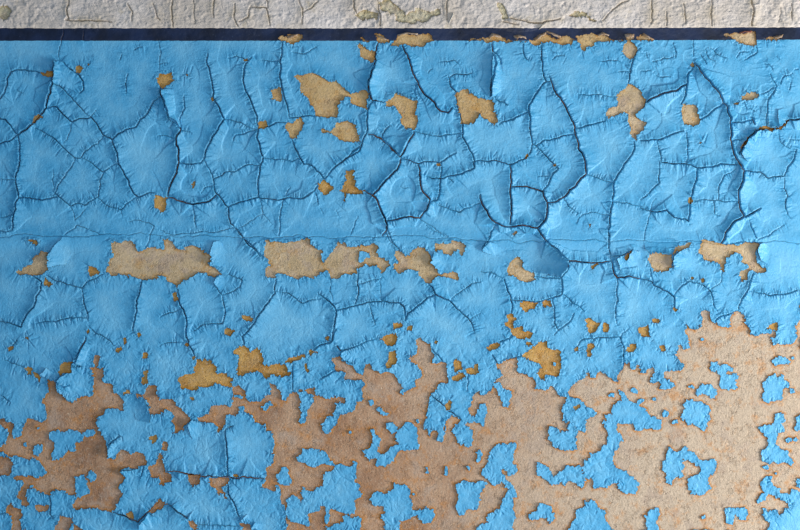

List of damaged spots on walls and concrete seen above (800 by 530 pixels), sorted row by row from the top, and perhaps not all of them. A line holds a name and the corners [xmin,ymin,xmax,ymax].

peeling [469,31,654,60]
peeling [294,73,369,143]
peeling [385,83,418,130]
peeling [455,89,498,125]
peeling [606,84,647,141]
crack [0,14,800,382]
peeling [88,238,228,302]
peeling [264,238,466,284]
peeling [644,239,770,283]
crack [56,332,113,402]
peeling [0,310,800,530]
crack [112,426,262,530]